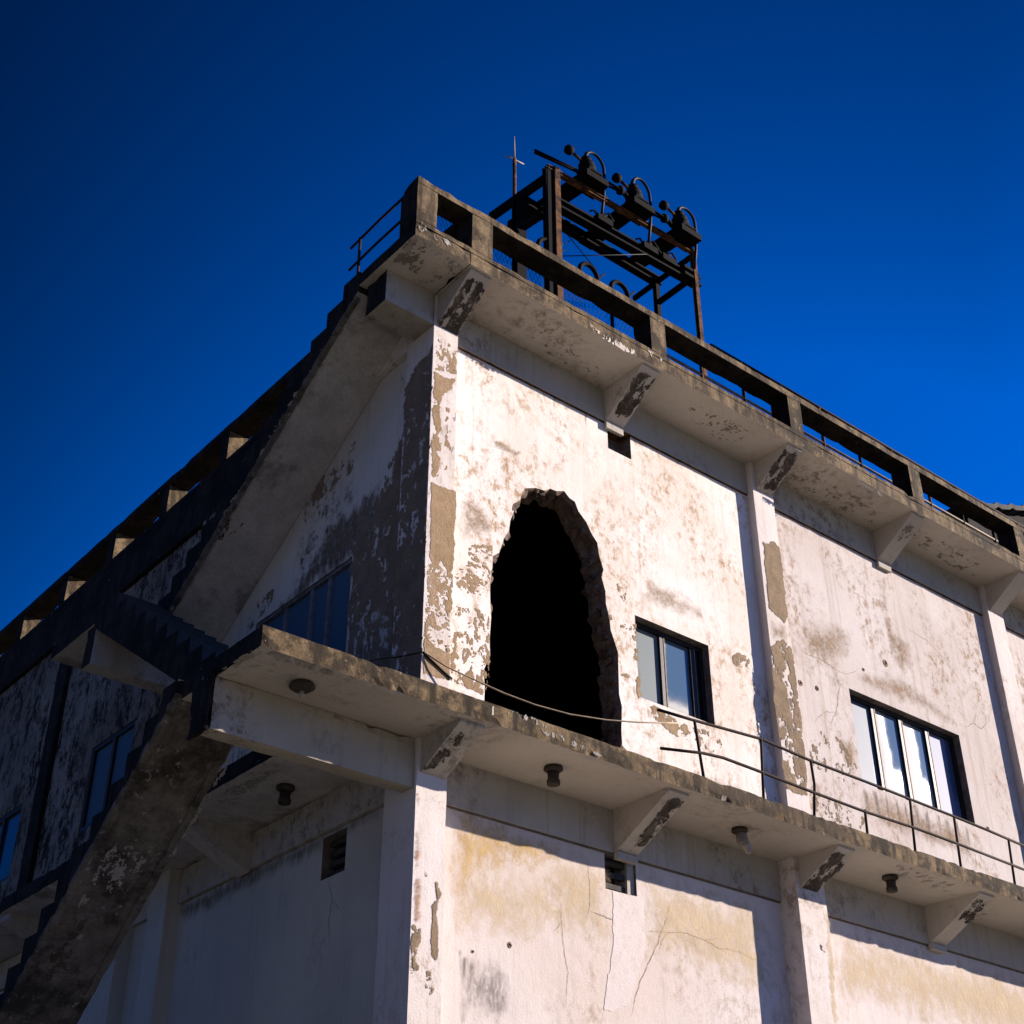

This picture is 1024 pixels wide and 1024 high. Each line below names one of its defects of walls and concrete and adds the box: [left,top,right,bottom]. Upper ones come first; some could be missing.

peeling [615,372,655,418]
peeling [247,222,642,756]
peeling [763,541,788,623]
water stain [460,817,543,882]
peeling [634,798,684,847]
peeling [803,852,845,892]
peeling [411,874,441,995]
crack [633,905,753,1009]